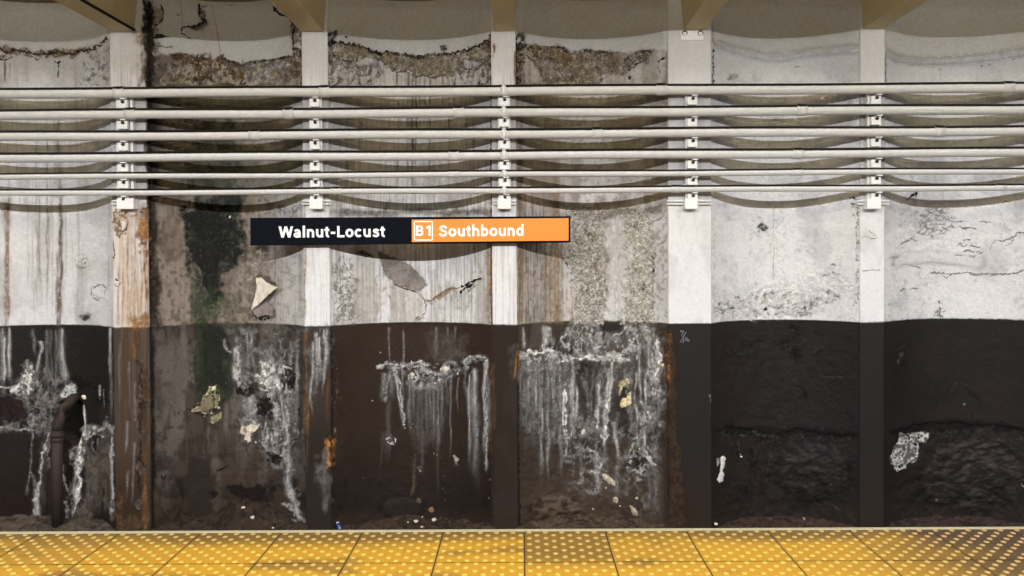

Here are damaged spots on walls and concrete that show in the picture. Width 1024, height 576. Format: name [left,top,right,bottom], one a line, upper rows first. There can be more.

spalling [327,30,491,86]
spalling [516,33,653,85]
rust [127,207,148,299]
peeling [378,252,427,321]
crack [930,232,1024,318]
water stain [0,202,76,515]
rust [115,312,149,531]
water stain [210,324,332,522]
rust [324,440,335,467]
efflorescence [372,328,491,494]
water stain [518,243,667,516]
peeling [890,432,929,471]